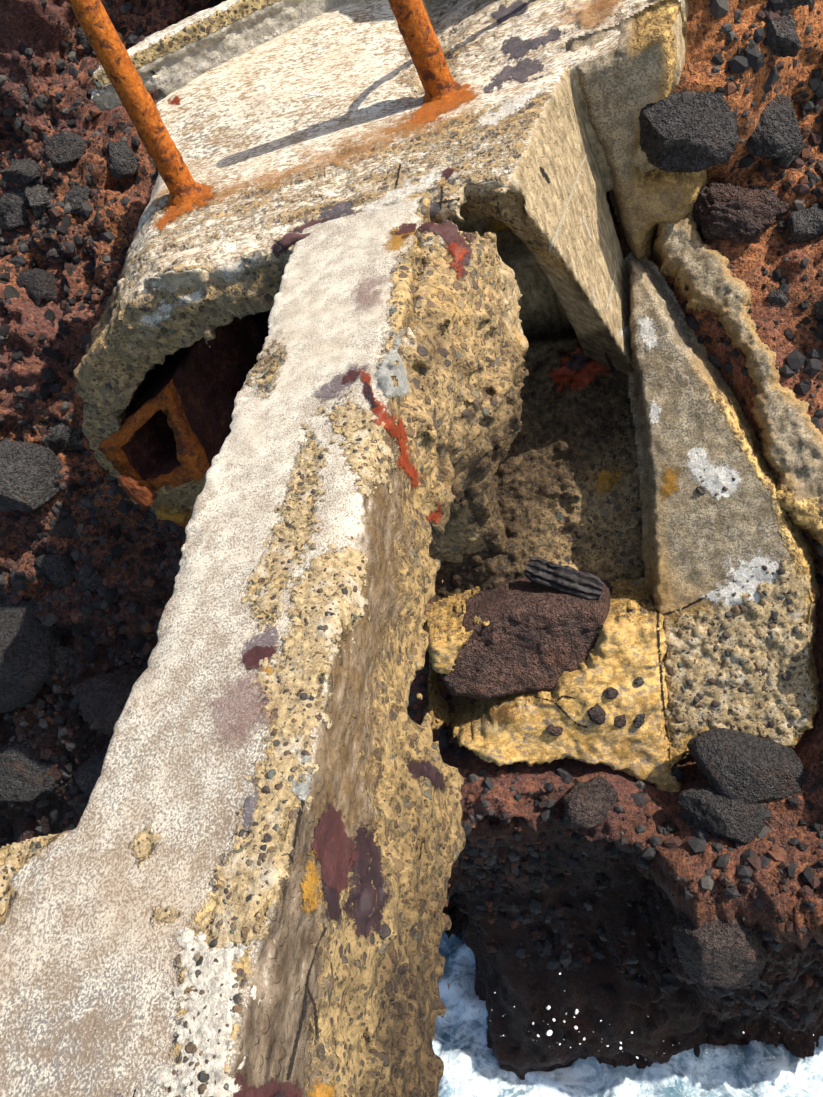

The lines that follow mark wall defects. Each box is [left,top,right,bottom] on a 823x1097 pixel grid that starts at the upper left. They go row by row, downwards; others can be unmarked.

spalling [242,329,289,397]
corrosion [313,363,424,488]
crack [533,695,587,728]
crack [656,581,736,723]
spalling [662,548,820,749]